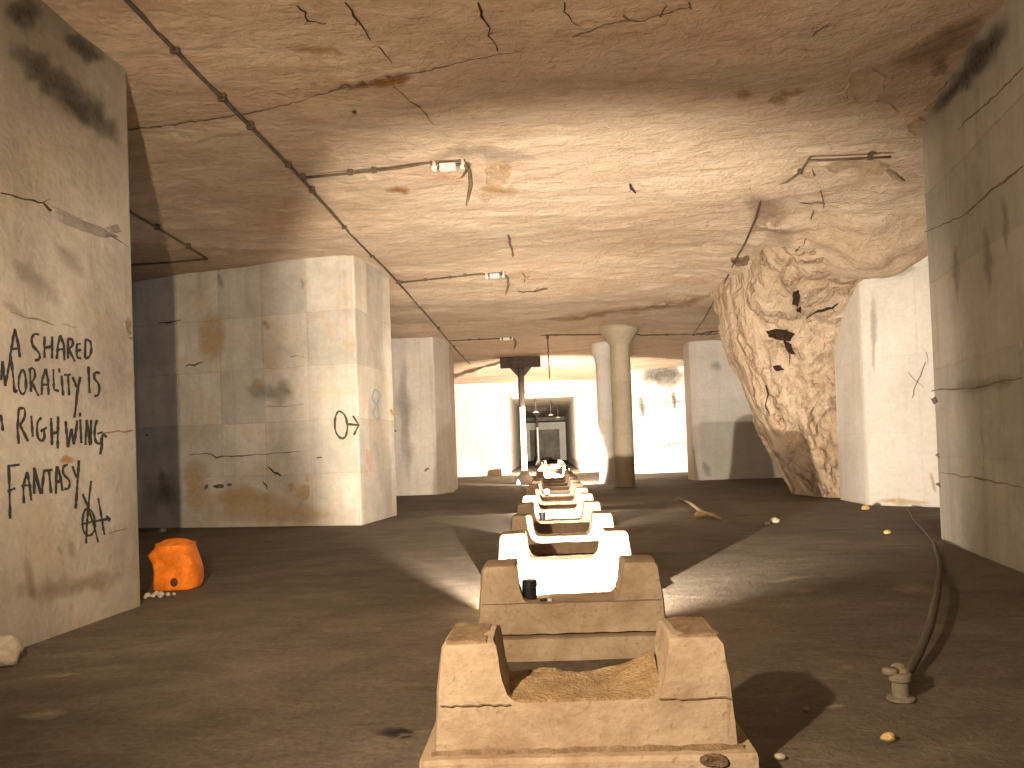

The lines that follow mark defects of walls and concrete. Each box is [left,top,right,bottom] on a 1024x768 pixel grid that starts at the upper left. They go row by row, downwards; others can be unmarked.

crack [563,2,692,38]
leakage [68,36,99,60]
leakage [26,57,113,134]
crack [128,2,520,131]
rust [353,76,407,88]
leakage [939,28,1001,107]
crack [1,192,52,212]
spalling [792,290,801,313]
spalling [766,329,795,355]
leakage [644,367,678,383]
crack [908,353,1023,398]
crack [190,451,322,489]